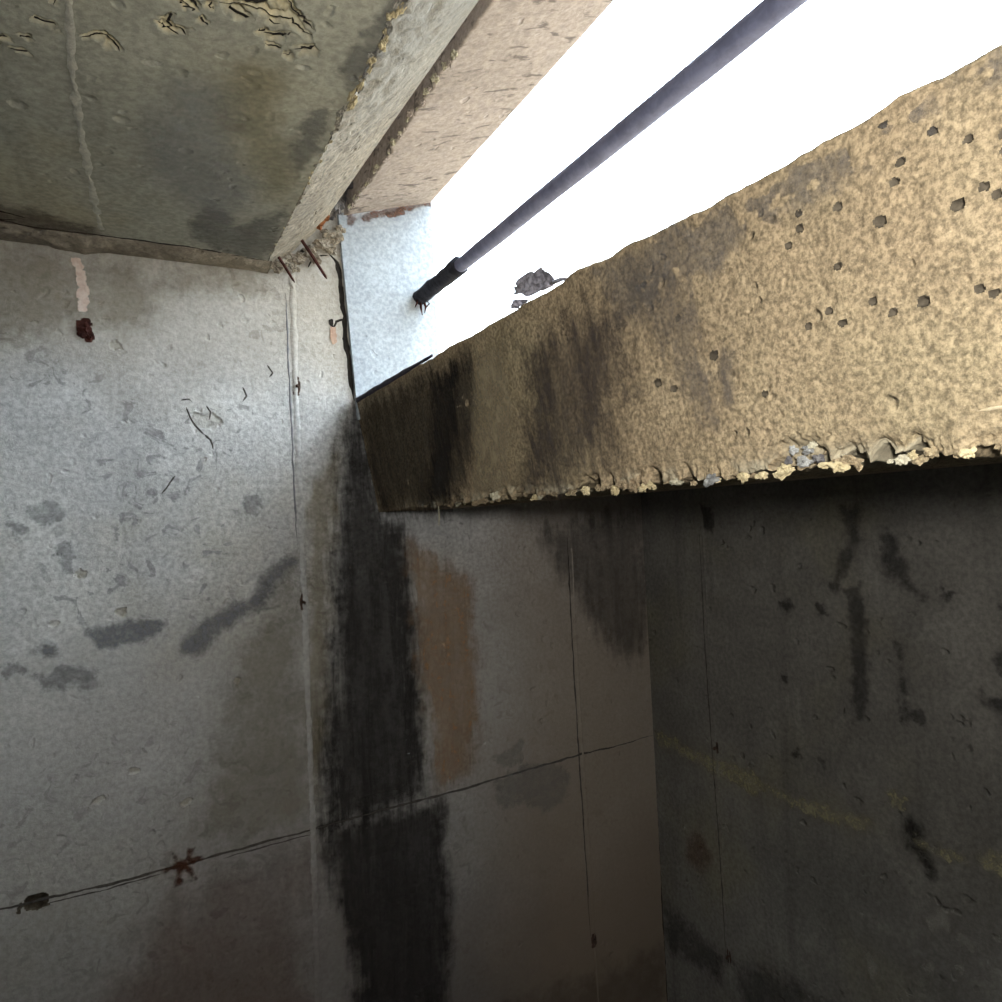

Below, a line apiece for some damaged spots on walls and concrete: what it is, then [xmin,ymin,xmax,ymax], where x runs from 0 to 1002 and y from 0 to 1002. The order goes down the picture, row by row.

spalling [79,28,125,53]
spalling [153,0,324,71]
spalling [269,0,411,255]
corrosion [76,318,95,343]
spalling [886,446,939,466]
spalling [953,446,977,459]
spalling [411,473,722,510]
water stain [181,558,296,653]
water stain [86,620,163,649]
water stain [317,350,510,1002]
crack [0,735,653,910]
corrosion [165,849,202,886]